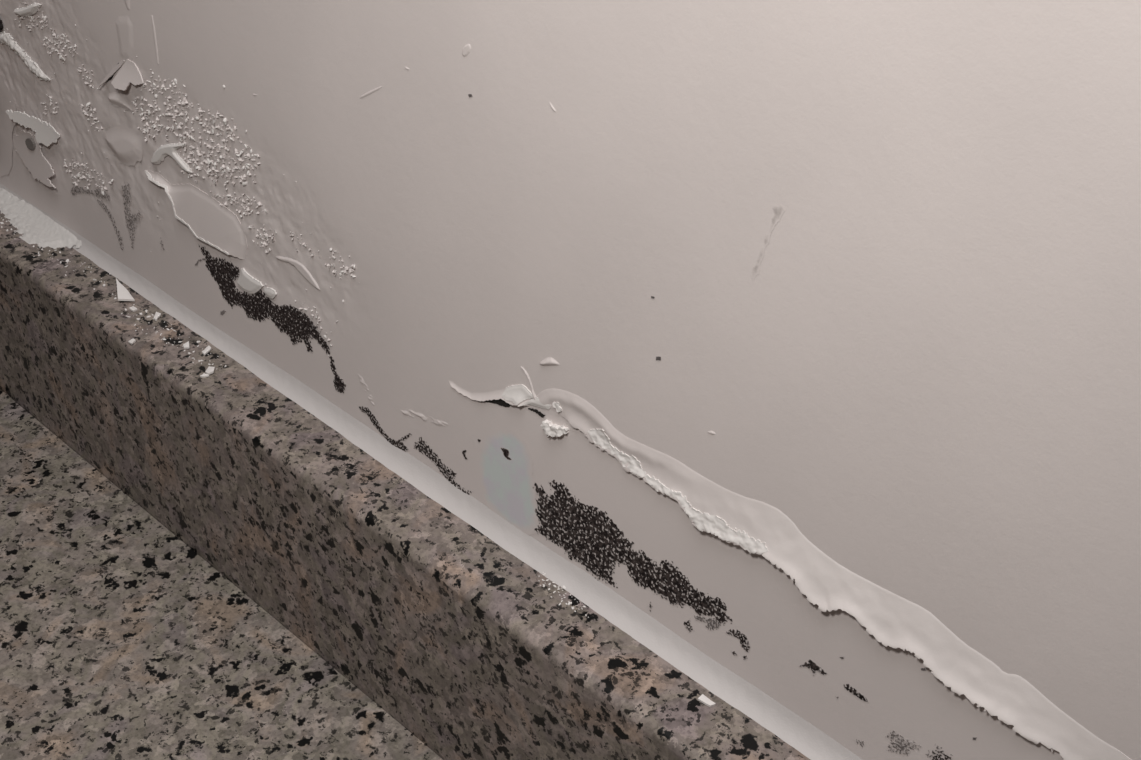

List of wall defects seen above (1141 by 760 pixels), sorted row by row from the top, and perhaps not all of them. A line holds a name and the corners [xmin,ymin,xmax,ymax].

peeling [98,59,144,91]
peeling [5,110,60,188]
peeling [145,170,248,260]
leakage [194,244,346,394]
leakage [359,406,751,660]
peeling [448,366,1131,760]
mould [885,729,953,760]